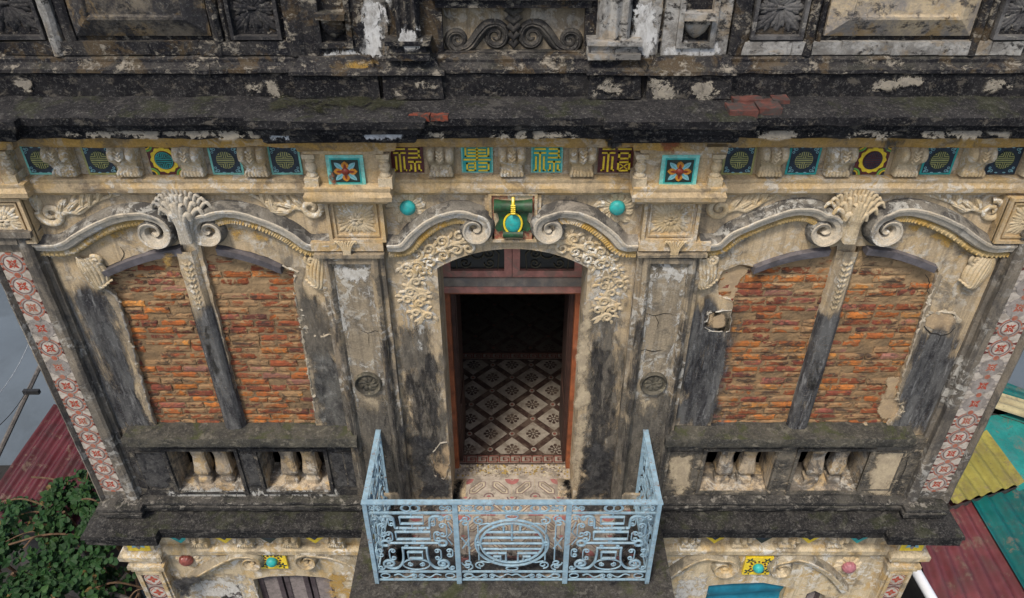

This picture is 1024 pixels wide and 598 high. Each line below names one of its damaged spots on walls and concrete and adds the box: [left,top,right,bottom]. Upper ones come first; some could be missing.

peeling [103,288,155,424]
peeling [282,264,331,423]